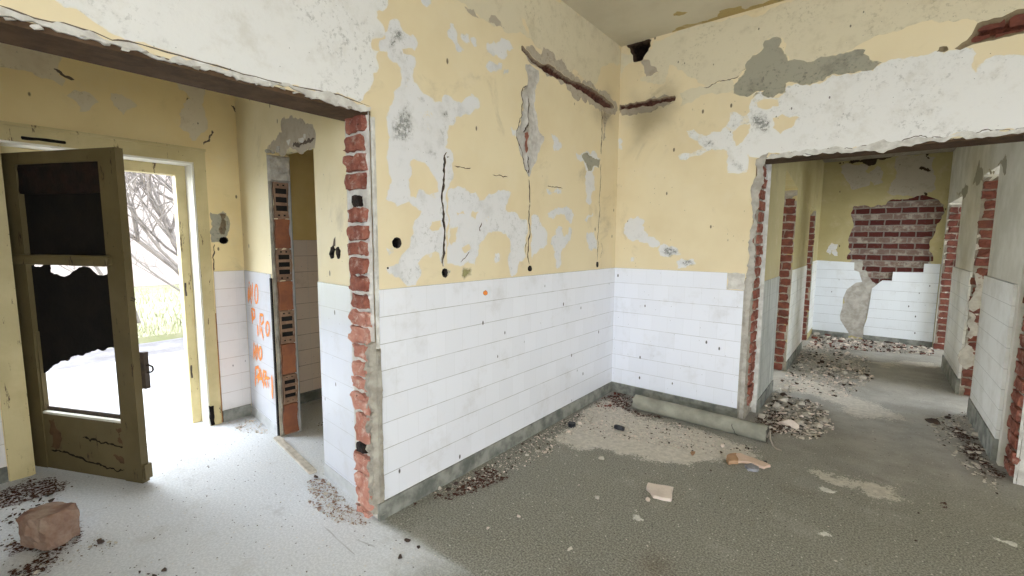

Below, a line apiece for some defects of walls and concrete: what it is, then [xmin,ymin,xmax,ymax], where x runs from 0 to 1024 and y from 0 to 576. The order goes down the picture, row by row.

crack [52,436,123,472]
spalling [265,115,316,437]
peeling [0,0,600,287]
flaking render [346,207,375,518]
crack [440,152,450,275]
crack [516,86,530,262]
crack [597,112,611,257]
peeling [447,0,1024,420]
spalling [1004,316,1024,486]